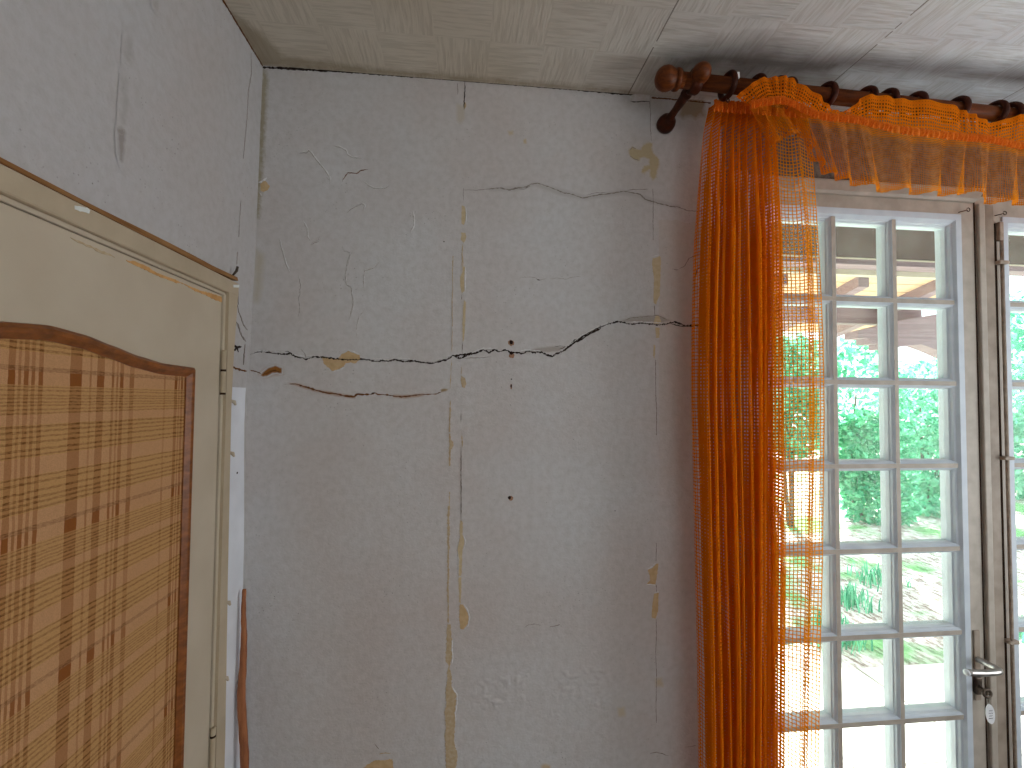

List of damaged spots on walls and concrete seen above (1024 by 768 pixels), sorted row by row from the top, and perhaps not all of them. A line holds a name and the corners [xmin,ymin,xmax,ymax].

crack [475,179,701,212]
peeling [322,350,360,372]
crack [234,295,701,400]
peeling [444,520,470,768]